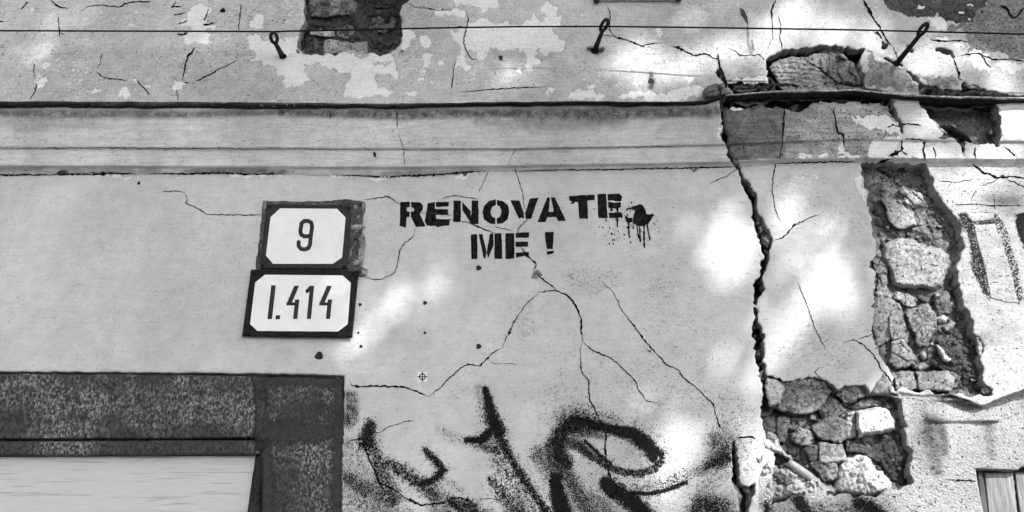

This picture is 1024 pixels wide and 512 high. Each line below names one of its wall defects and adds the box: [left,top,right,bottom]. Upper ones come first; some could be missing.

spalling [247,0,565,99]
peeling [568,84,605,101]
peeling [884,0,1024,75]
crack [0,0,861,482]
spalling [619,49,1024,504]